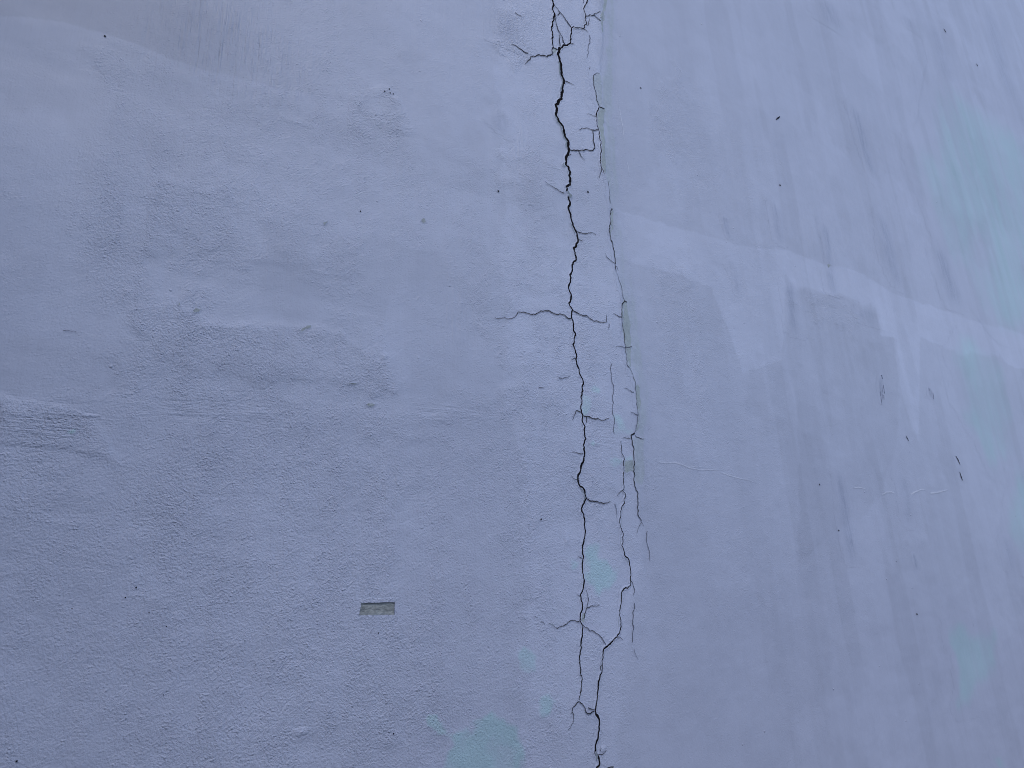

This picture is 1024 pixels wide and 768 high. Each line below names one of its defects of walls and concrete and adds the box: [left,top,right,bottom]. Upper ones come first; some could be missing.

flaking render [354,597,399,621]
crack [496,0,650,768]